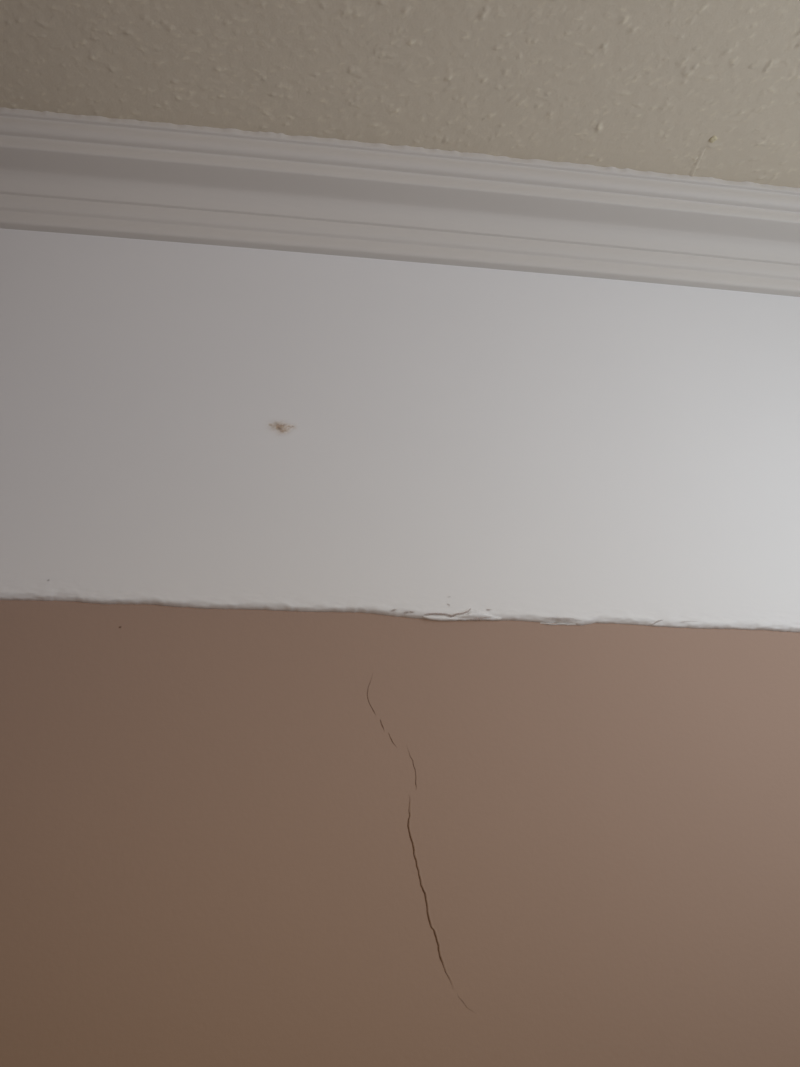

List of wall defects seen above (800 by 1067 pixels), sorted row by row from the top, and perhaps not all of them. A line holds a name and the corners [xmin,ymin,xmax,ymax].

crack [407,764,456,990]